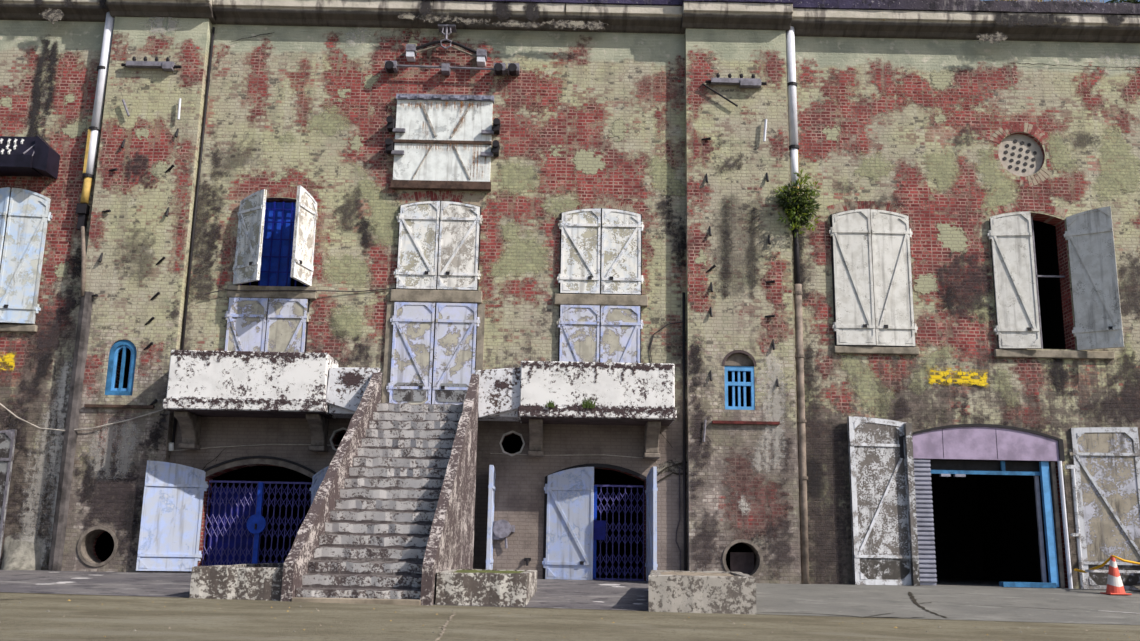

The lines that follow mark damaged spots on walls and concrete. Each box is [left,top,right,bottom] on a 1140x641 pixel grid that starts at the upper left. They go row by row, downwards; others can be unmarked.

water stain [0,248,81,564]
water stain [27,34,58,138]
peeling [0,49,195,385]
water stain [170,131,226,322]
water stain [75,350,328,572]
peeling [234,167,331,282]
peeling [306,297,367,389]
water stain [334,185,377,252]
peeling [291,13,717,322]
water stain [755,335,851,584]
peeling [750,51,1088,214]
peeling [867,155,1052,428]